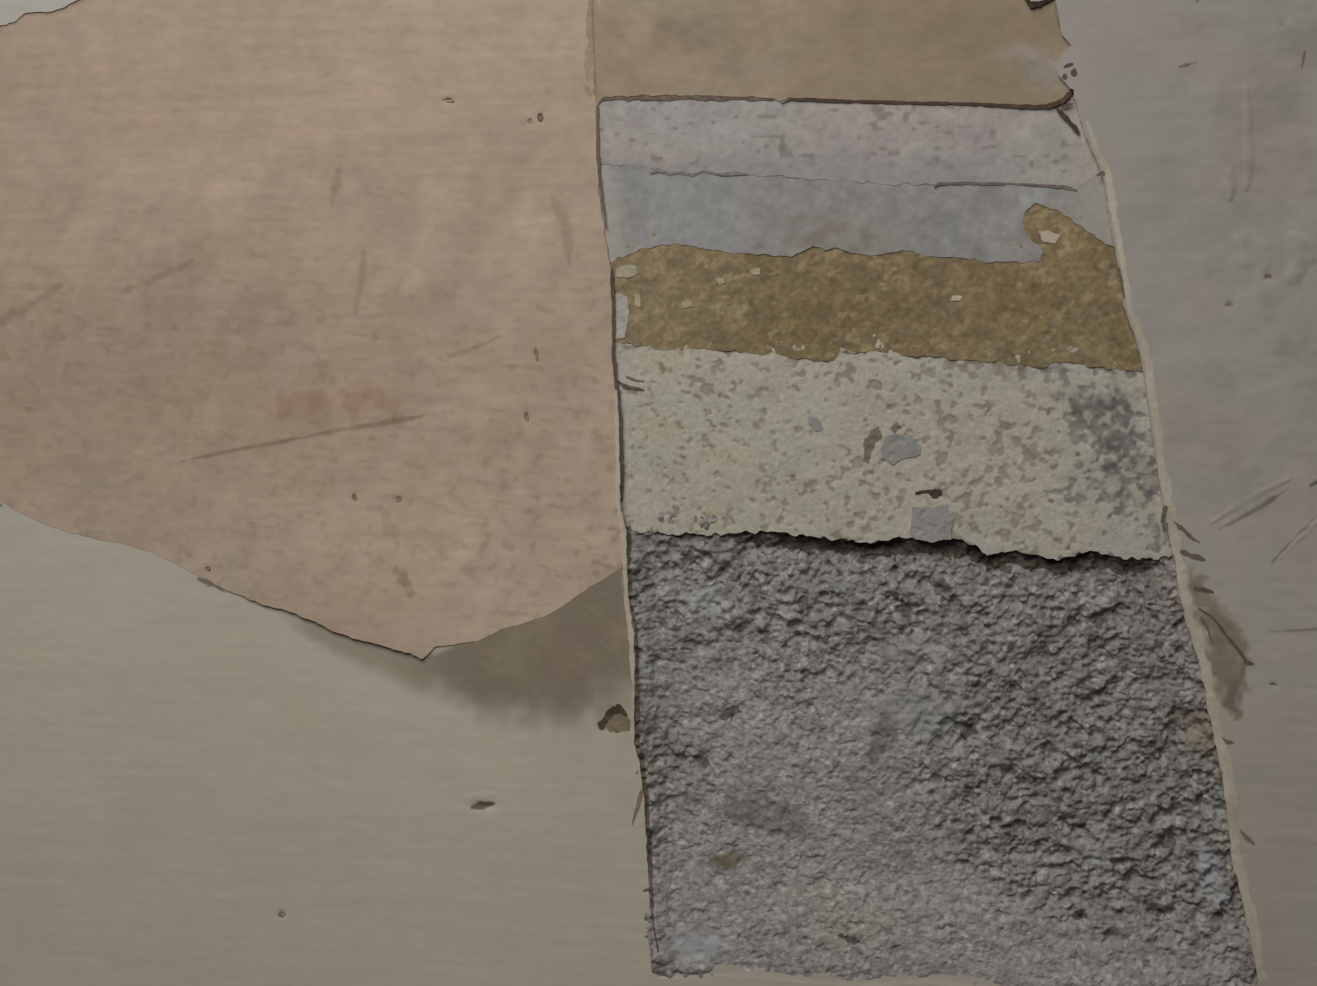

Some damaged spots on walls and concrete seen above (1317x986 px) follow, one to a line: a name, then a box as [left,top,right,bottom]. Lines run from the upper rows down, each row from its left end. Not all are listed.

leakage [426,565,634,709]
peeling [0,0,1071,685]
crack [591,0,1079,229]
spalling [597,92,1267,986]